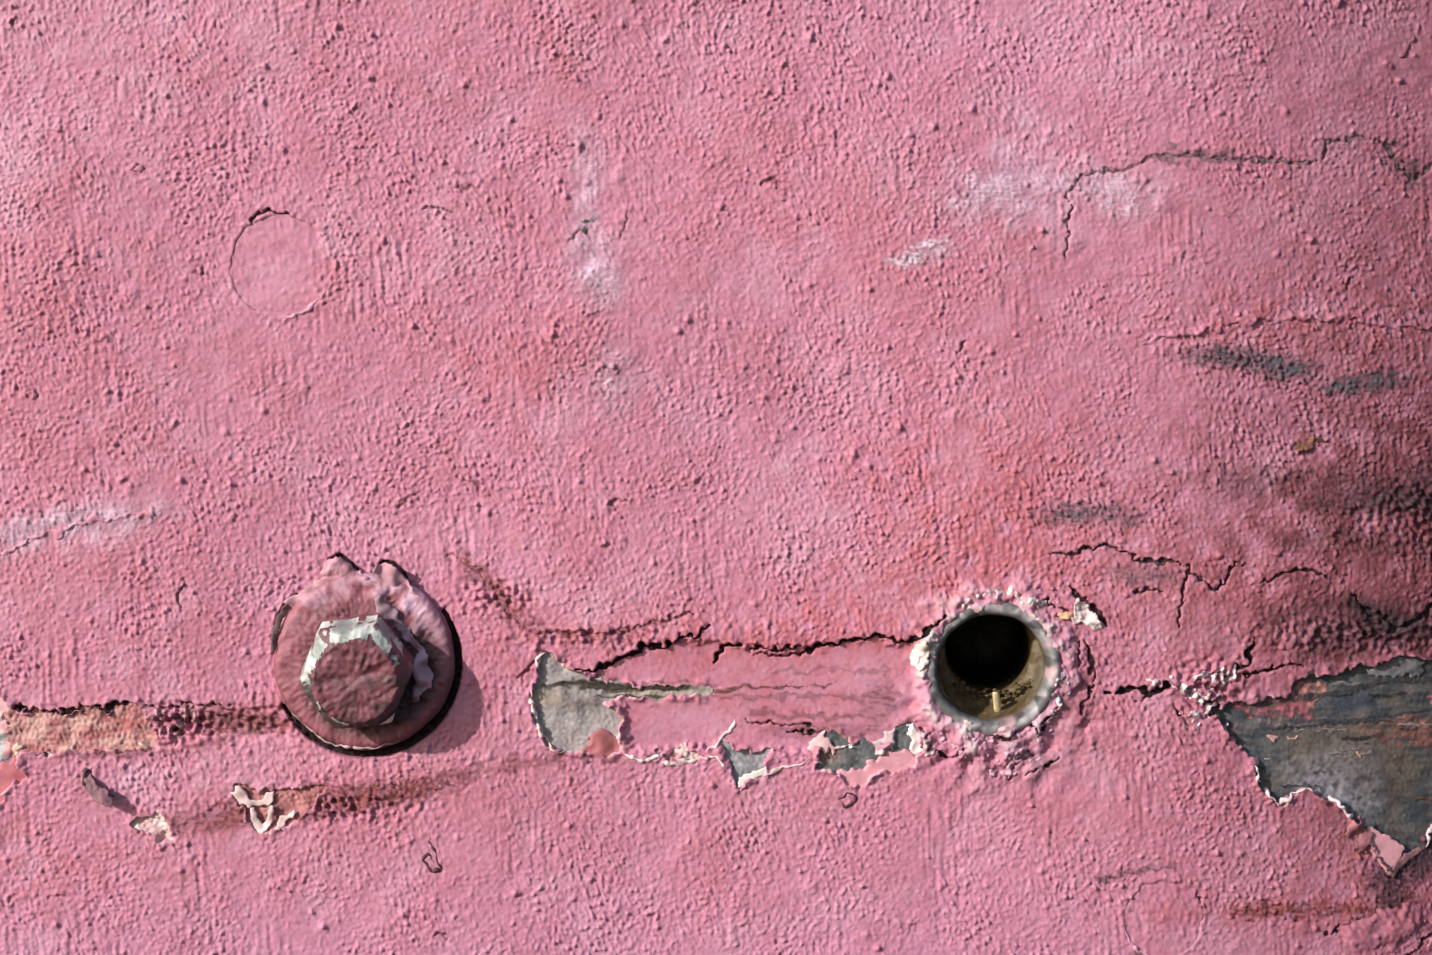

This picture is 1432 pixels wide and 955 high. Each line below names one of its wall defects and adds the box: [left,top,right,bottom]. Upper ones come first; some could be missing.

crack [1063,136,1432,257]
peeling [0,698,201,808]
peeling [131,810,174,841]
rust [170,710,288,733]
crack [446,553,947,678]
crack [747,720,824,735]
peeling [528,651,1071,790]
peeling [910,640,931,672]
crack [919,543,1432,781]
peeling [1145,656,1432,878]